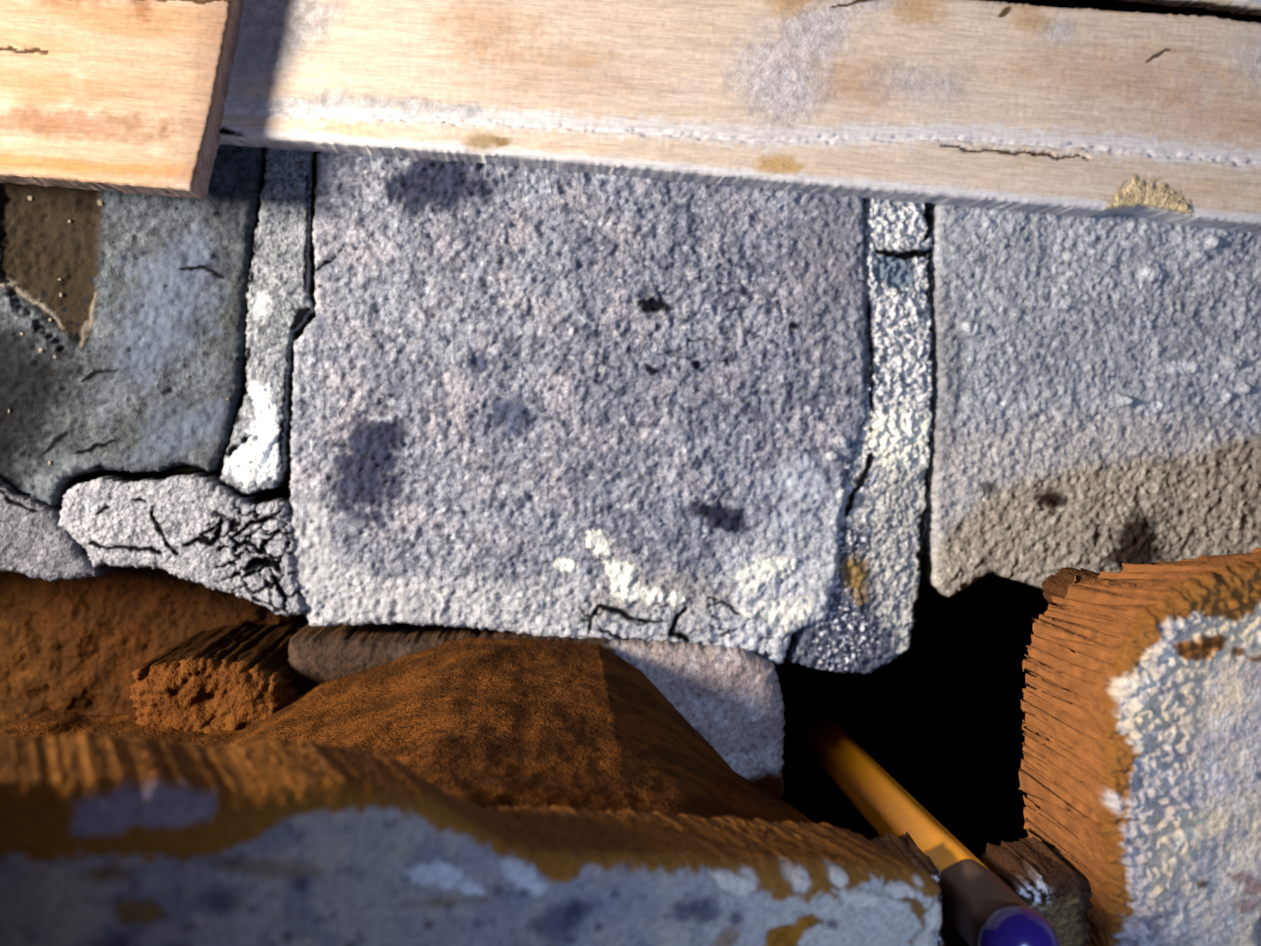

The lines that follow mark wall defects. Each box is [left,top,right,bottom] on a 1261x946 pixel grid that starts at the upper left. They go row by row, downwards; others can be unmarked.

water stain [386,159,494,209]
crack [179,244,256,285]
crack [226,175,344,470]
crack [43,432,113,476]
water stain [224,381,281,489]
water stain [331,410,403,522]
crack [845,227,935,571]
crack [89,498,308,615]
water stain [294,505,338,604]
water stain [585,529,686,607]
crack [579,596,783,658]
water stain [732,554,814,632]